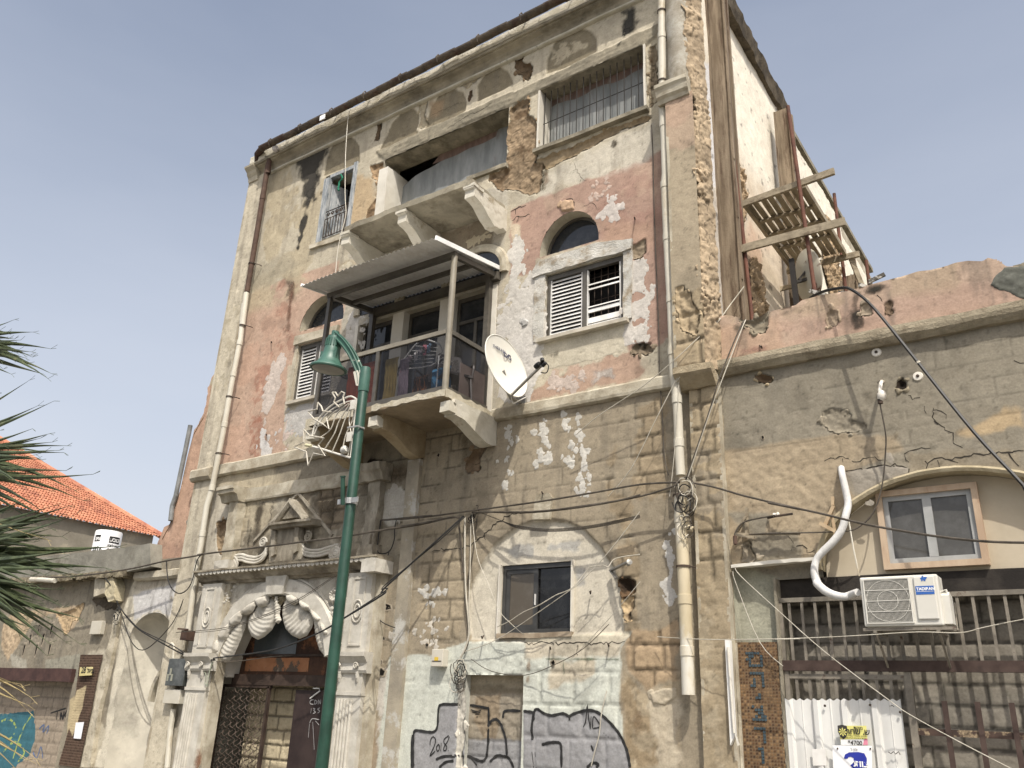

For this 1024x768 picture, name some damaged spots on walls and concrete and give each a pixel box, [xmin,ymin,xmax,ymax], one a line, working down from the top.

flaking render [488,46,658,195]
damp [296,148,328,249]
peeling [588,174,625,223]
flaking render [673,0,722,369]
peeling [496,234,657,404]
peeling [256,352,314,456]
peeling [496,410,592,498]
crack [825,395,1024,473]
peeling [412,584,449,649]
flaking render [618,577,635,623]
peeling [659,528,678,607]